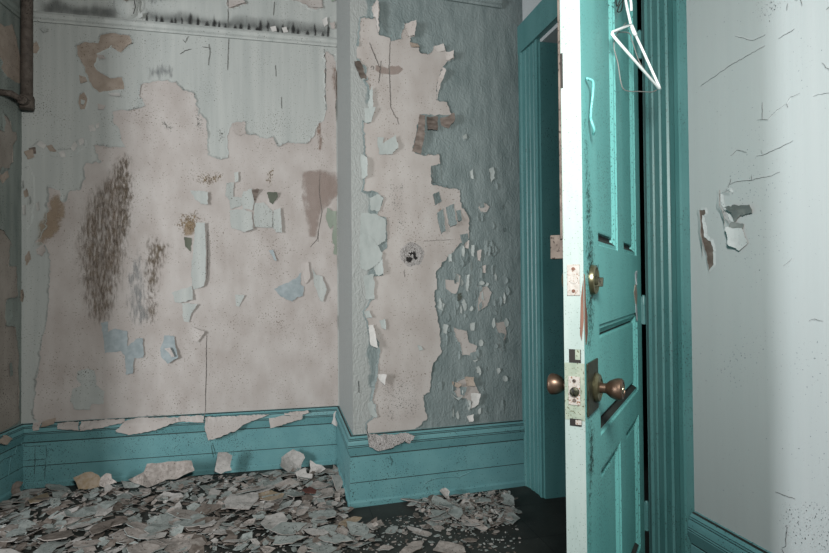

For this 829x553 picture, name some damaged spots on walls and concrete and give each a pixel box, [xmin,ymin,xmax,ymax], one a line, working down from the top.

peeling [0,22,20,85]
crack [701,0,802,86]
crack [757,92,829,121]
water stain [82,159,132,319]
water stain [148,244,165,292]
peeling [0,32,338,445]
peeling [354,0,510,451]